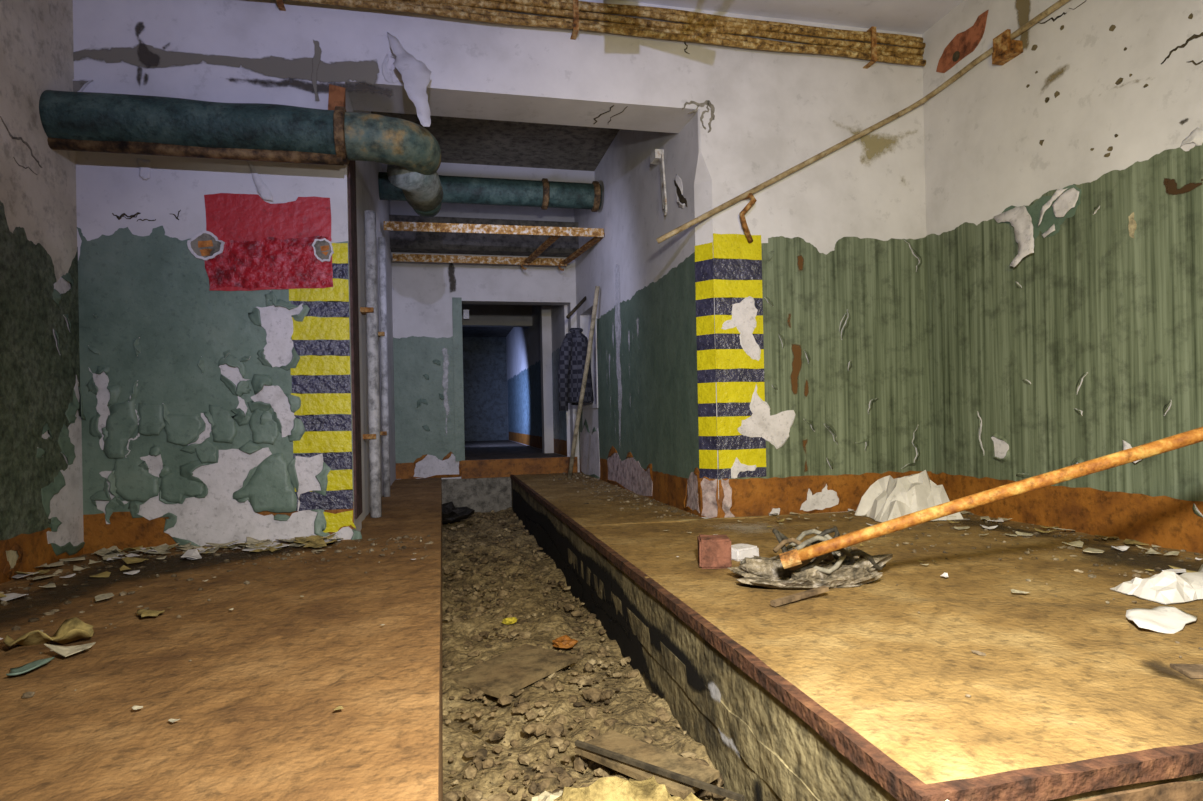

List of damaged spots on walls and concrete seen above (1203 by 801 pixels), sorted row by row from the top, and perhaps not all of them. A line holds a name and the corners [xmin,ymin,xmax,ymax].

damp [73,22,393,101]
peeling [382,48,403,83]
crack [1161,32,1203,65]
peeling [1180,118,1203,151]
peeling [1128,212,1137,238]
flaking render [187,231,225,261]
flaking render [312,238,334,262]
peeling [52,273,73,306]
peeling [721,296,773,361]
peeling [36,290,362,556]
peeling [684,457,756,518]